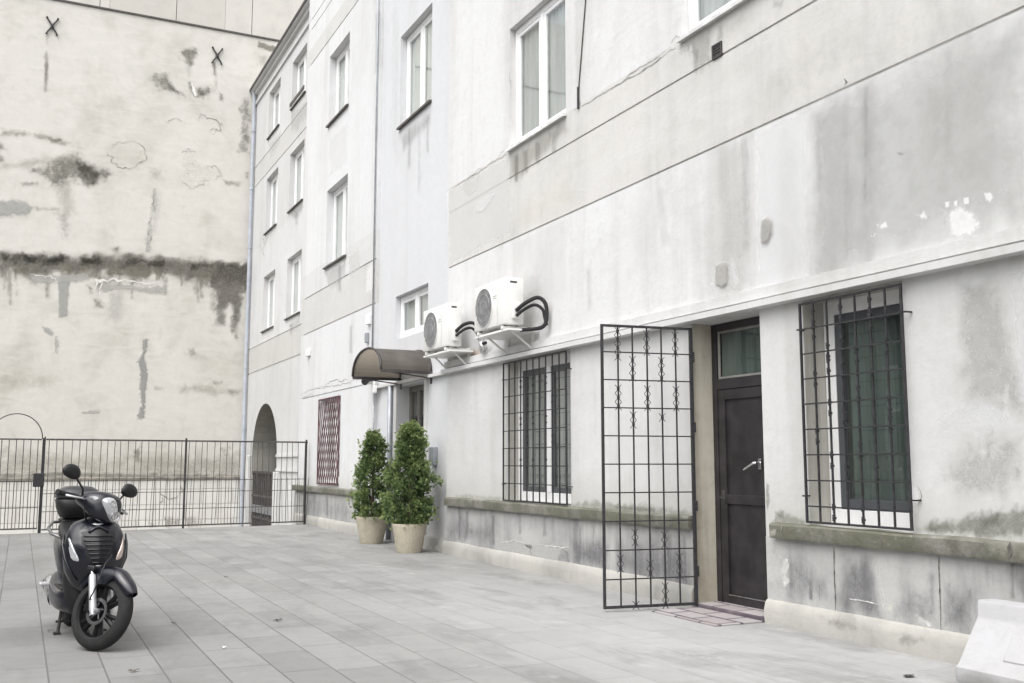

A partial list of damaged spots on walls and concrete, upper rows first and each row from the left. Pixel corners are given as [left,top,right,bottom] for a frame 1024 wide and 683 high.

water stain [32,158,99,185]
water stain [826,53,1002,243]
peeling [944,197,979,236]
water stain [0,252,247,331]
water stain [847,562,874,610]